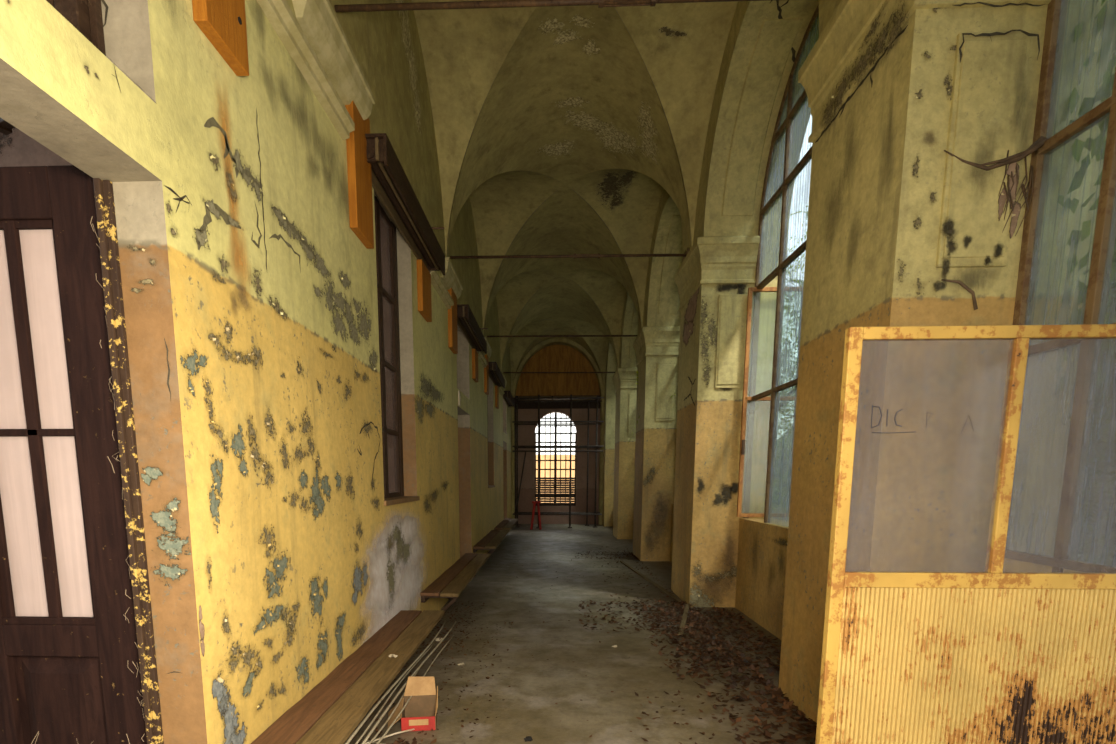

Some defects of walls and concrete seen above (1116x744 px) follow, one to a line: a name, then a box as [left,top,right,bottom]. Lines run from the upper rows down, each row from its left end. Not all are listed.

peeling [192,199,244,284]
peeling [209,150,377,400]
mould [934,219,972,291]
mould [985,244,1003,265]
peeling [180,317,355,534]
peeling [414,374,444,423]
peeling [141,466,163,486]
peeling [149,497,191,587]
efflorescence [367,518,422,638]
peeling [385,517,411,609]
peeling [212,522,368,744]